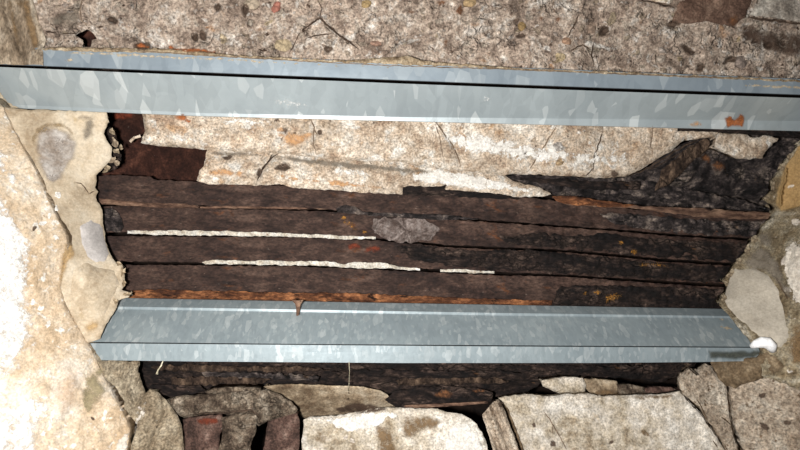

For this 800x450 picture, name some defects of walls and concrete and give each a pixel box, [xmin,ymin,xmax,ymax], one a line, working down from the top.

crack [46,0,800,81]
spalling [102,126,141,173]
peeling [413,169,533,192]
peeling [445,132,626,178]
corrosion [520,115,800,237]
spalling [113,261,133,304]
spalling [720,235,759,303]